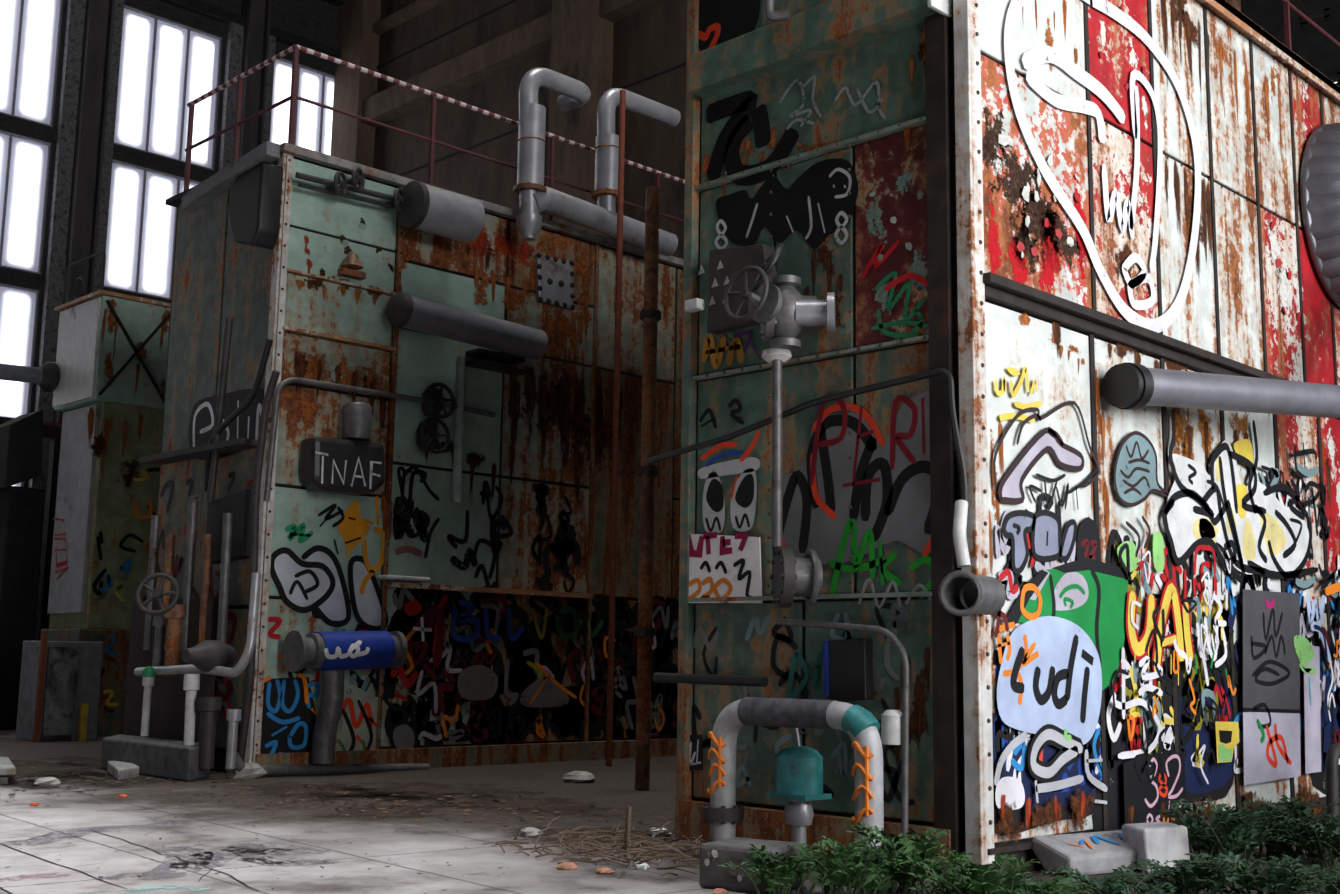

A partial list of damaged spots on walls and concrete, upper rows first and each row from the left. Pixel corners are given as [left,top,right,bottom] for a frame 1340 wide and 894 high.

peeling [1129,34,1146,74]
corrosion [1161,0,1293,151]
peeling [982,104,1087,294]
corrosion [296,235,383,304]
peeling [1268,220,1303,321]
corrosion [292,348,386,429]
corrosion [425,233,622,510]
corrosion [989,420,1004,571]
corrosion [1317,438,1331,529]